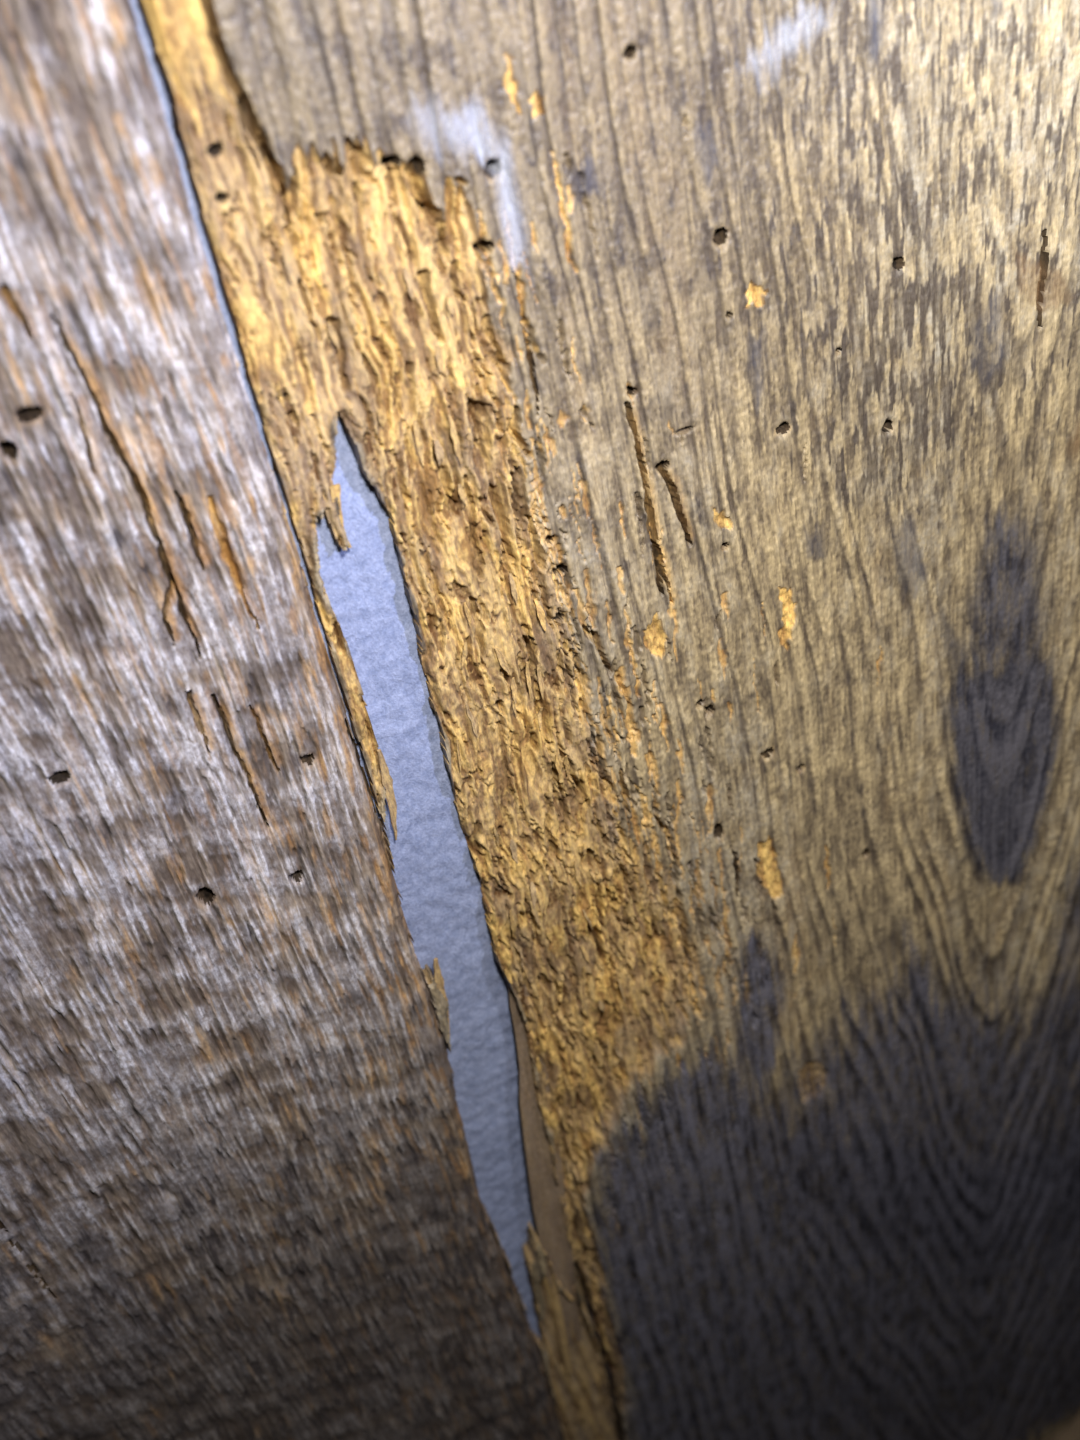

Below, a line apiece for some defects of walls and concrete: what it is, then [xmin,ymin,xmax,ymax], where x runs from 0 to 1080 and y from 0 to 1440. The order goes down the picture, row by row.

peeling [397,229,414,299]
peeling [327,323,339,348]
peeling [447,296,475,334]
peeling [413,414,462,466]
peeling [458,484,468,507]
peeling [711,505,734,531]
peeling [509,573,546,631]
peeling [643,611,669,660]
peeling [494,647,544,730]
crack [345,718,385,825]
peeling [529,874,553,942]
peeling [504,950,524,984]